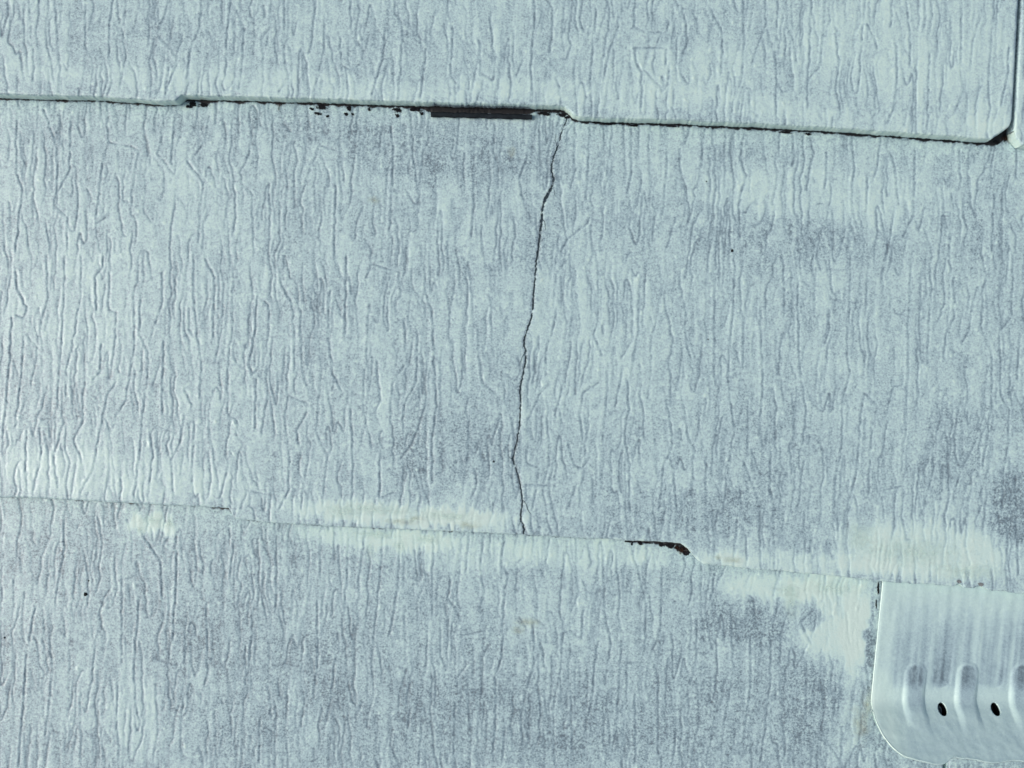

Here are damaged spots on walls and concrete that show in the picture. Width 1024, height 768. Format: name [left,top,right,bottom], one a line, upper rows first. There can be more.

crack [509,119,567,534]